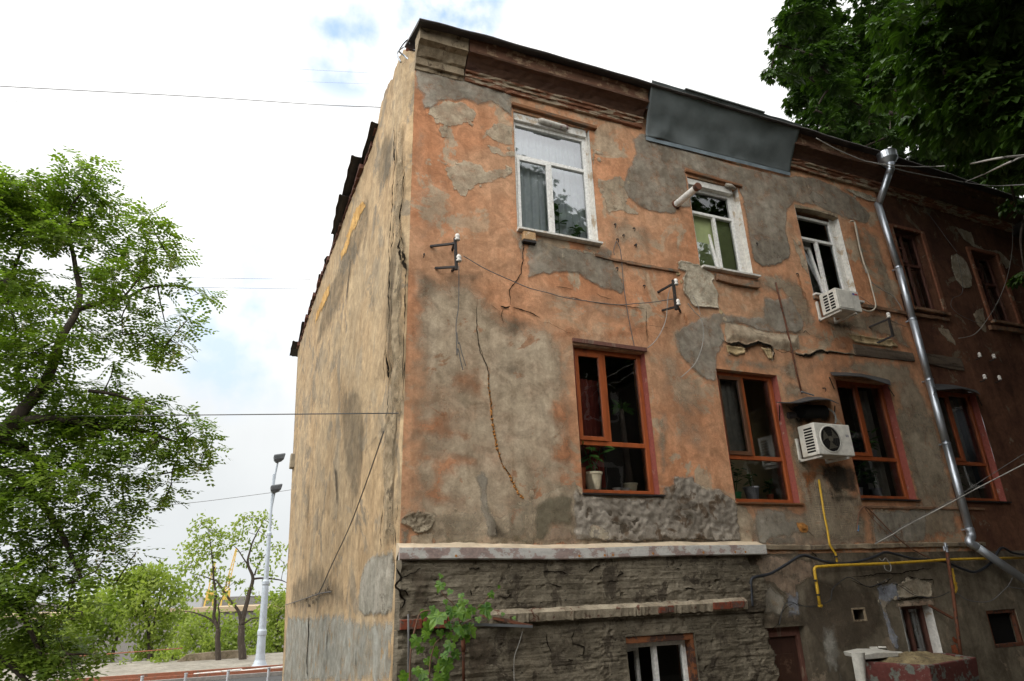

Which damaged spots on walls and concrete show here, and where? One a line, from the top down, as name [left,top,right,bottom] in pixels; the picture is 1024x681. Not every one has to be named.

peeling [428,101,476,138]
crack [383,135,407,415]
crack [476,243,574,499]
crack [556,286,666,338]
peeling [382,123,865,619]
crack [723,323,856,357]